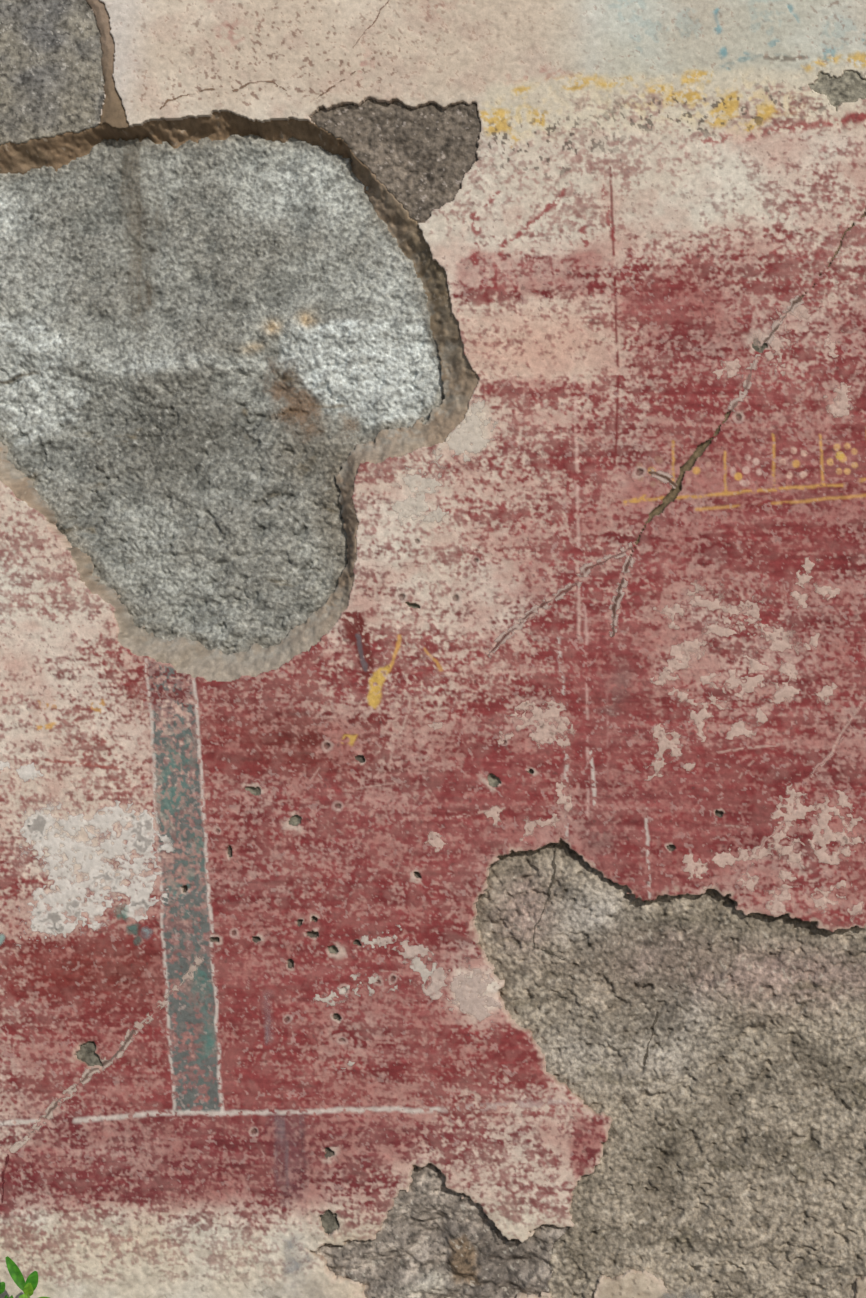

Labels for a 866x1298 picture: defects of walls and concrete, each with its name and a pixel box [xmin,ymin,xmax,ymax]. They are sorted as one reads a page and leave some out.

crack [160,80,286,110]
crack [320,0,389,96]
spalling [808,71,866,111]
spalling [0,0,498,681]
crack [486,212,866,658]
peeling [497,700,573,747]
spalling [297,916,338,953]
spalling [314,782,866,1298]